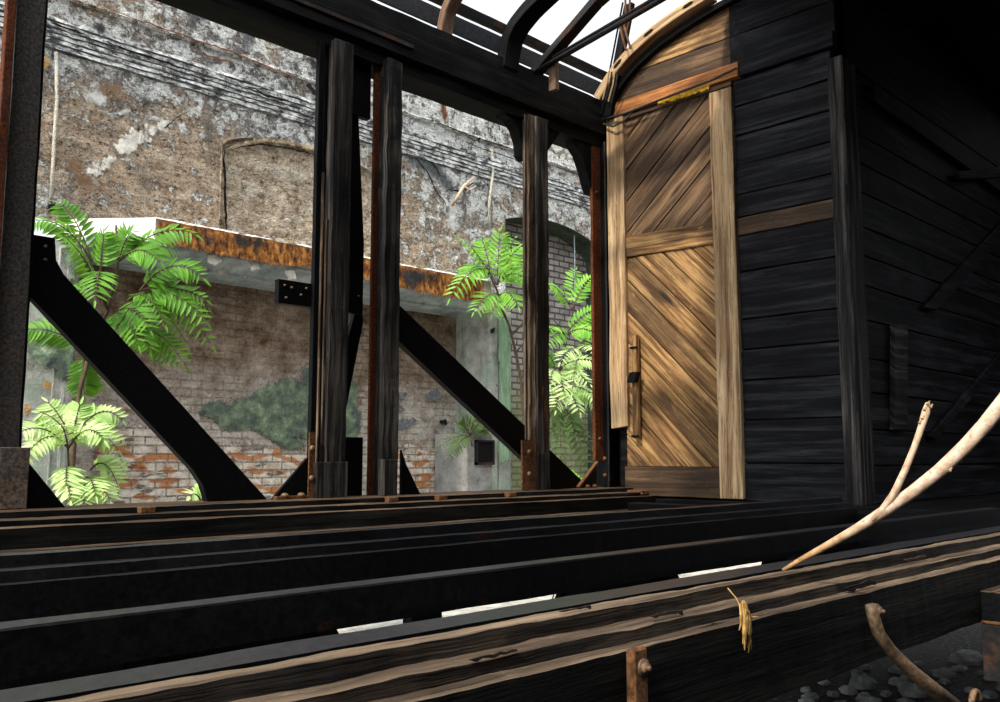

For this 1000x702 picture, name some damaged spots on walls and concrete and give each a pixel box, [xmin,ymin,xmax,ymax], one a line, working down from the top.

water stain [86,80,127,106]
water stain [68,113,170,189]
rust [158,220,312,267]
rust [399,265,484,302]
peeling [198,365,309,499]
peeling [346,378,363,437]
flaking render [92,424,197,504]